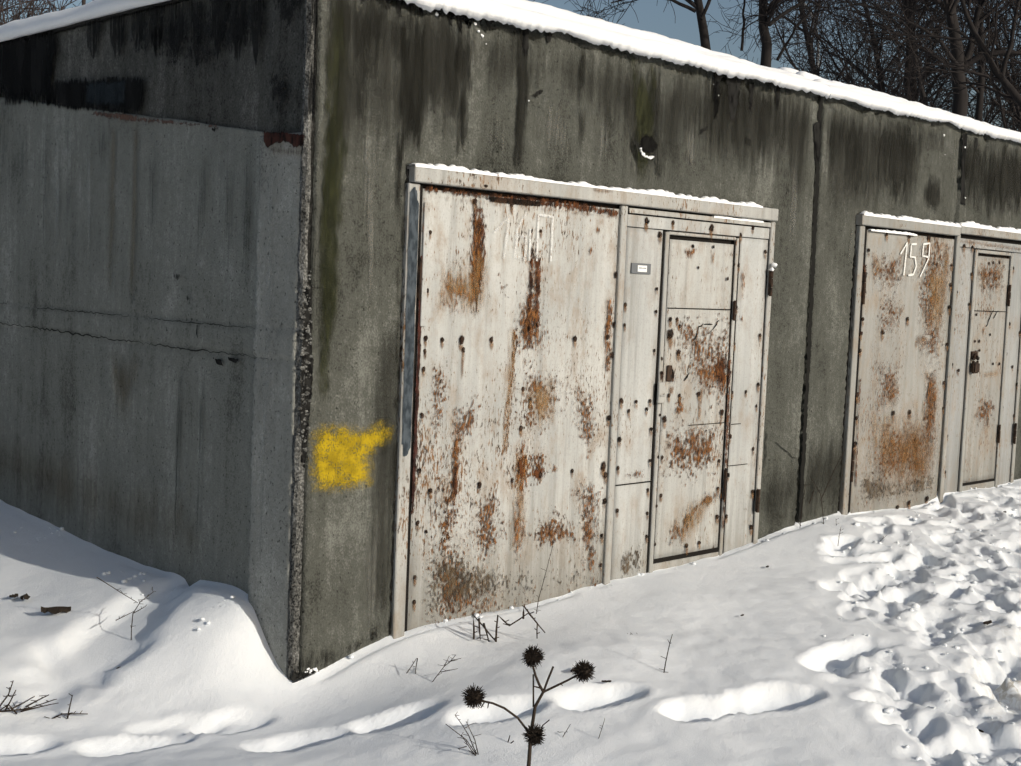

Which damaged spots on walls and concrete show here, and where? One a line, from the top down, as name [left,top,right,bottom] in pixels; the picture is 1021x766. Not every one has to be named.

damp [85,0,266,69]
corrosion [264,131,305,153]
damp [308,0,472,389]
damp [495,29,529,165]
corrosion [425,175,618,312]
damp [571,54,808,177]
damp [830,113,923,197]
damp [926,177,940,211]
corrosion [971,244,1014,306]
corrosion [411,229,743,624]
corrosion [854,235,960,509]
corrosion [973,393,996,431]